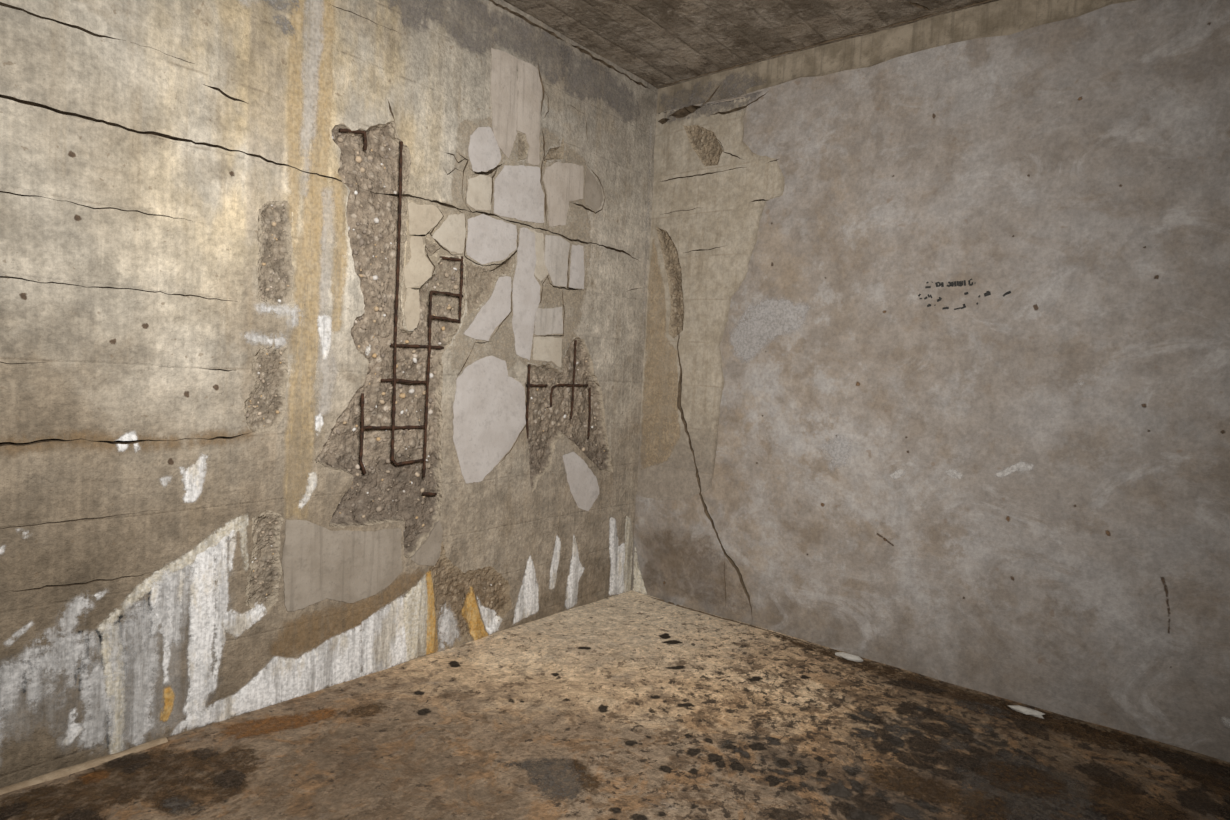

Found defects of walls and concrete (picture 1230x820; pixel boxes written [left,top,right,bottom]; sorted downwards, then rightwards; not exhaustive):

crack [0,2,249,104]
crack [489,0,991,182]
corrosion [286,0,347,457]
crack [0,63,642,377]
crack [0,432,251,446]
leakage [0,516,584,820]
peeling [282,48,613,651]
leakage [609,516,647,595]
leakage [659,633,683,644]
crack [648,328,1020,706]
leakage [497,758,601,799]
leakage [608,807,667,820]